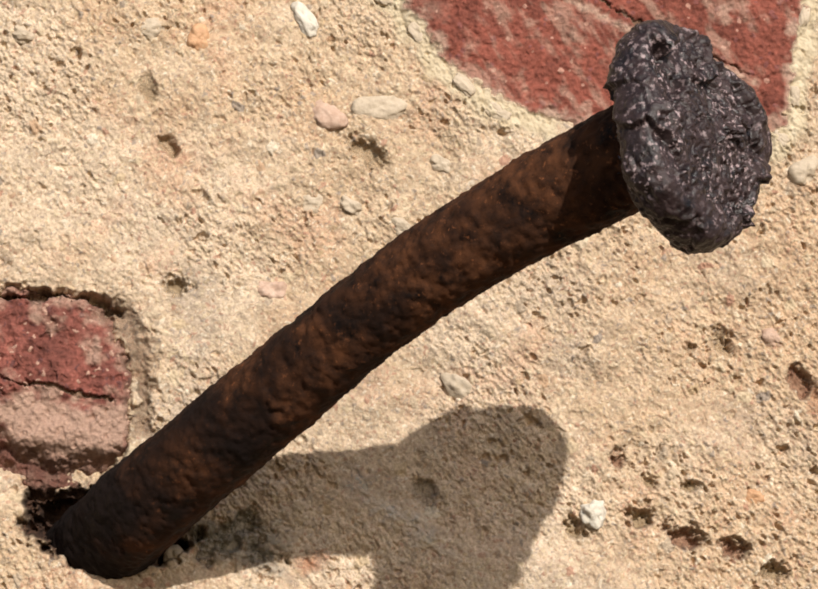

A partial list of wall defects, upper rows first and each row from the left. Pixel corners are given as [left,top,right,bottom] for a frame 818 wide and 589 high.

crack [600,0,642,25]